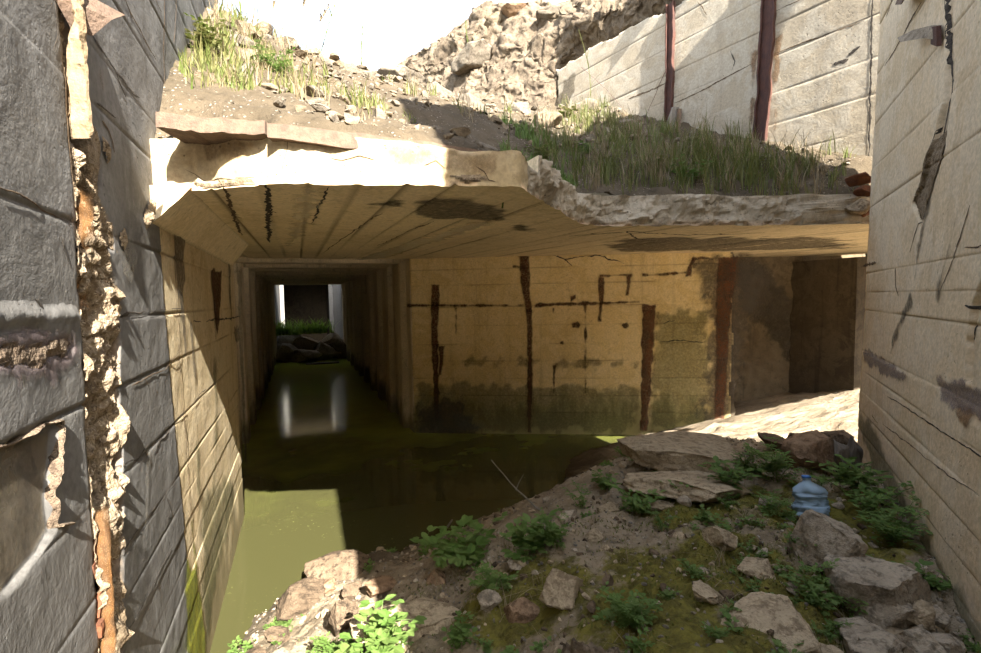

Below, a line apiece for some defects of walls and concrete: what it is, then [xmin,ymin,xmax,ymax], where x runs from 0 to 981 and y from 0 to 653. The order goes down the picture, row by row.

crack [629,51,751,103]
crack [776,0,921,156]
crack [931,0,954,143]
crack [187,142,288,242]
spalling [913,131,947,220]
spalling [57,0,135,653]
rust [211,268,222,333]
rust [407,256,738,432]
water stain [863,350,905,380]
water stain [937,375,981,420]
peeling [0,419,76,588]
rust [93,508,117,653]